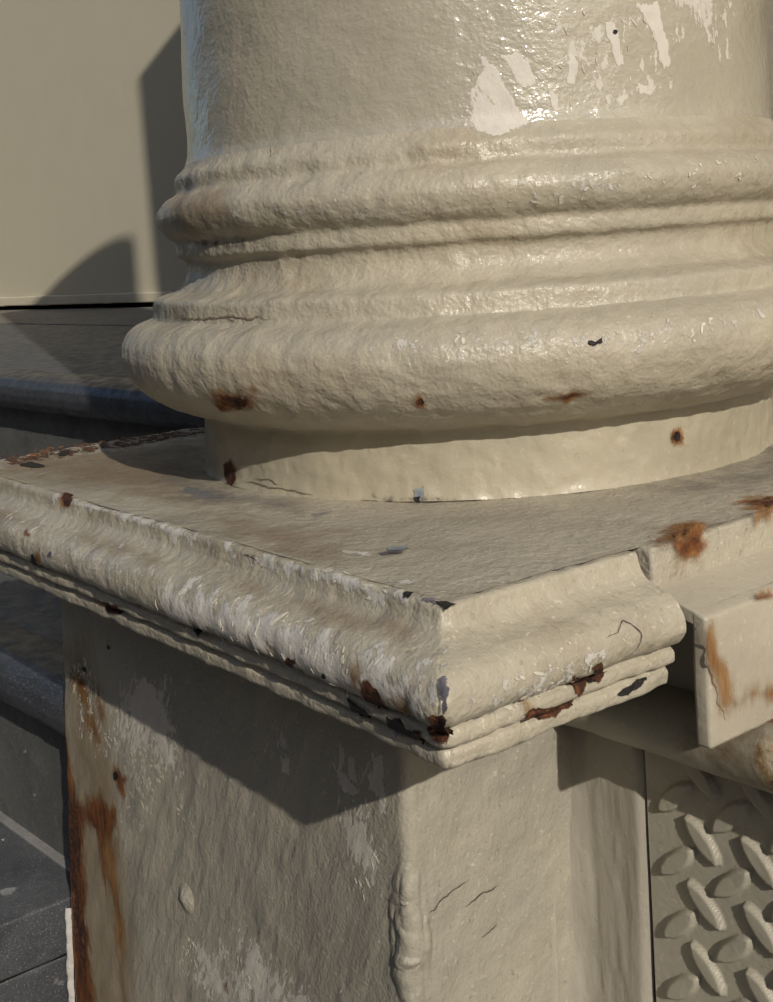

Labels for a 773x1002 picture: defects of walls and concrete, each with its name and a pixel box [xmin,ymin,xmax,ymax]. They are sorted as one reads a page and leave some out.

peeling [470,52,536,136]
peeling [548,0,734,112]
corrosion [211,389,257,412]
corrosion [546,392,589,404]
corrosion [0,425,205,468]
corrosion [659,521,707,560]
corrosion [739,496,773,525]
peeling [0,492,455,745]
peeling [104,666,196,847]
corrosion [64,653,127,1002]
peeling [320,742,389,915]
peeling [179,915,320,1002]